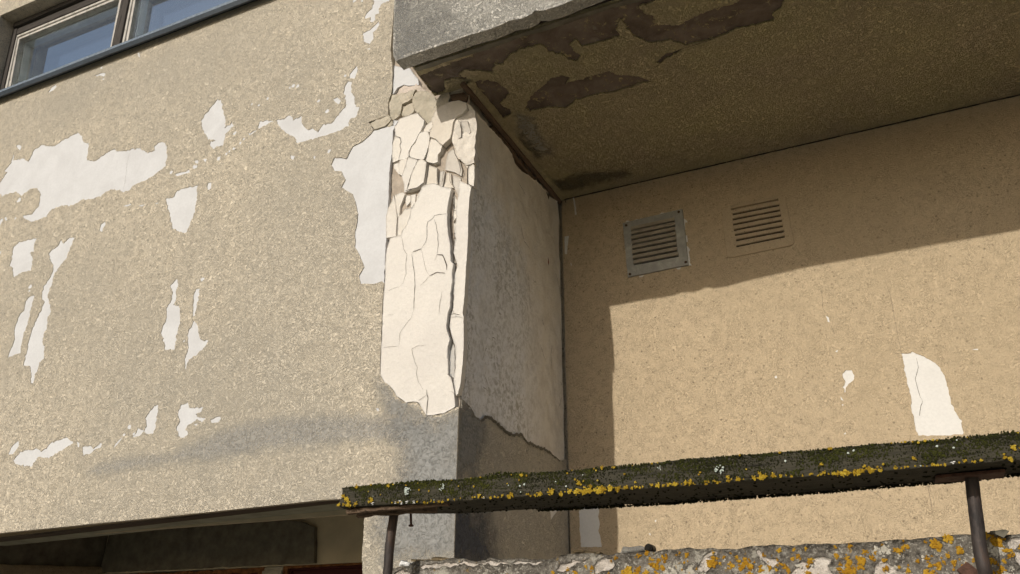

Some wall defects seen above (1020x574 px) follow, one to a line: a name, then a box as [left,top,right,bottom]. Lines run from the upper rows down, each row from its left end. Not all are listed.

peeling [0,66,359,225]
peeling [0,238,36,277]
peeling [125,182,211,233]
crack [383,115,479,418]
flaking render [327,0,784,461]
peeling [8,237,74,383]
peeling [161,278,208,369]
peeling [9,437,102,467]
peeling [114,405,158,447]
peeling [177,402,221,438]
peeling [902,352,964,436]